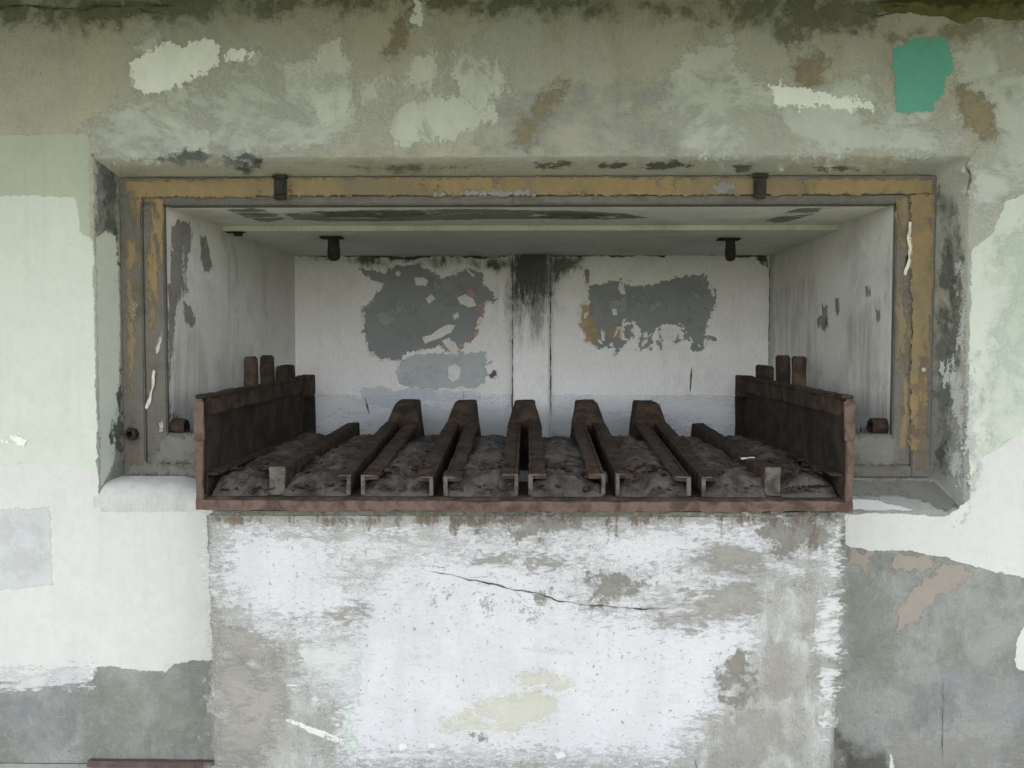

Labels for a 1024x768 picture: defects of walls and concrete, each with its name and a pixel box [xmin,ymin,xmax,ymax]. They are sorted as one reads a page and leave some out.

damp [0,0,217,33]
damp [241,0,301,19]
damp [384,0,611,55]
damp [722,0,888,47]
peeling [156,219,212,381]
peeling [359,262,498,390]
damp [474,254,583,335]
peeling [579,269,717,357]
rust [215,513,243,526]
rust [417,513,527,536]
rust [606,516,661,537]
crack [434,572,665,611]